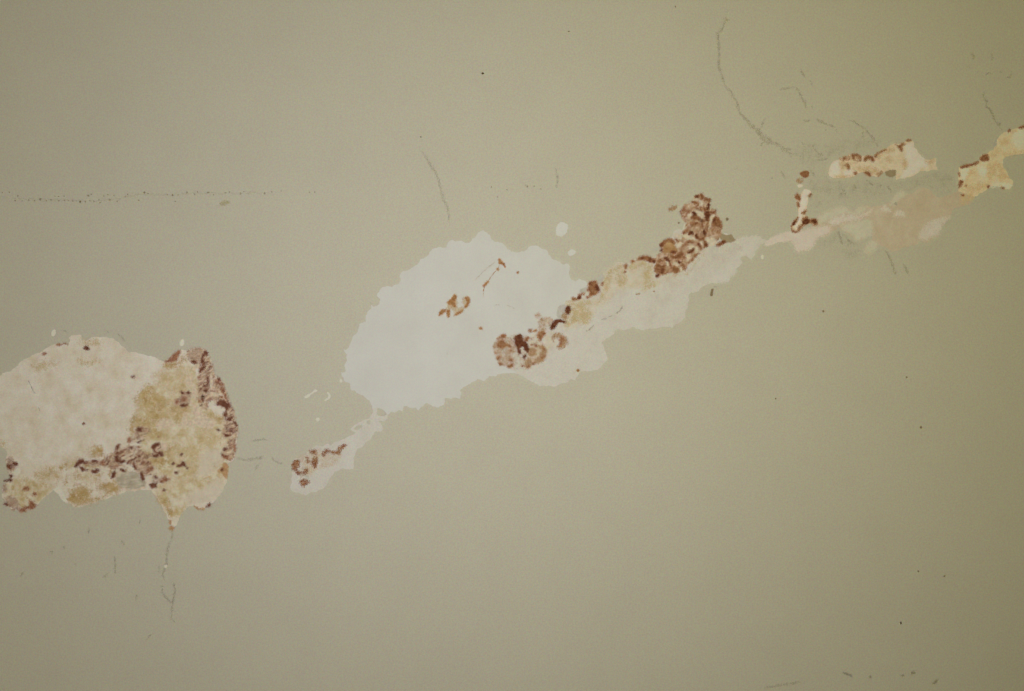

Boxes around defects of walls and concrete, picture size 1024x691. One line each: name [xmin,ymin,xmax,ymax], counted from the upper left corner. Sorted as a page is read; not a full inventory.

peeling [0,329,242,533]
peeling [287,124,1024,498]